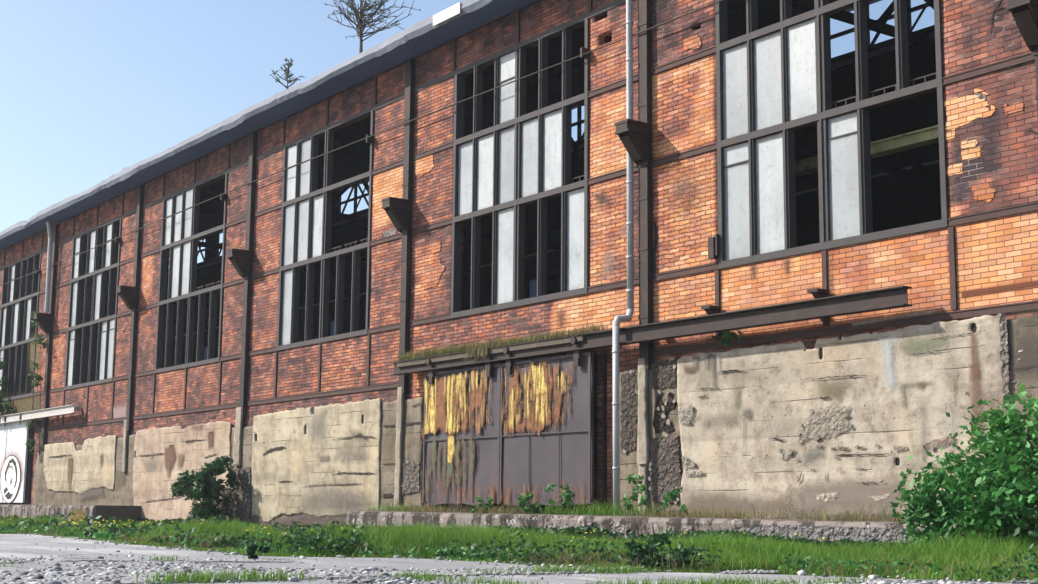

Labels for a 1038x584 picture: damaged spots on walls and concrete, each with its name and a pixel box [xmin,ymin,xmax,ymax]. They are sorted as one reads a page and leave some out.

peeling [944,89,1023,176]
peeling [972,183,995,202]
spalling [620,370,638,454]
spalling [648,357,681,505]